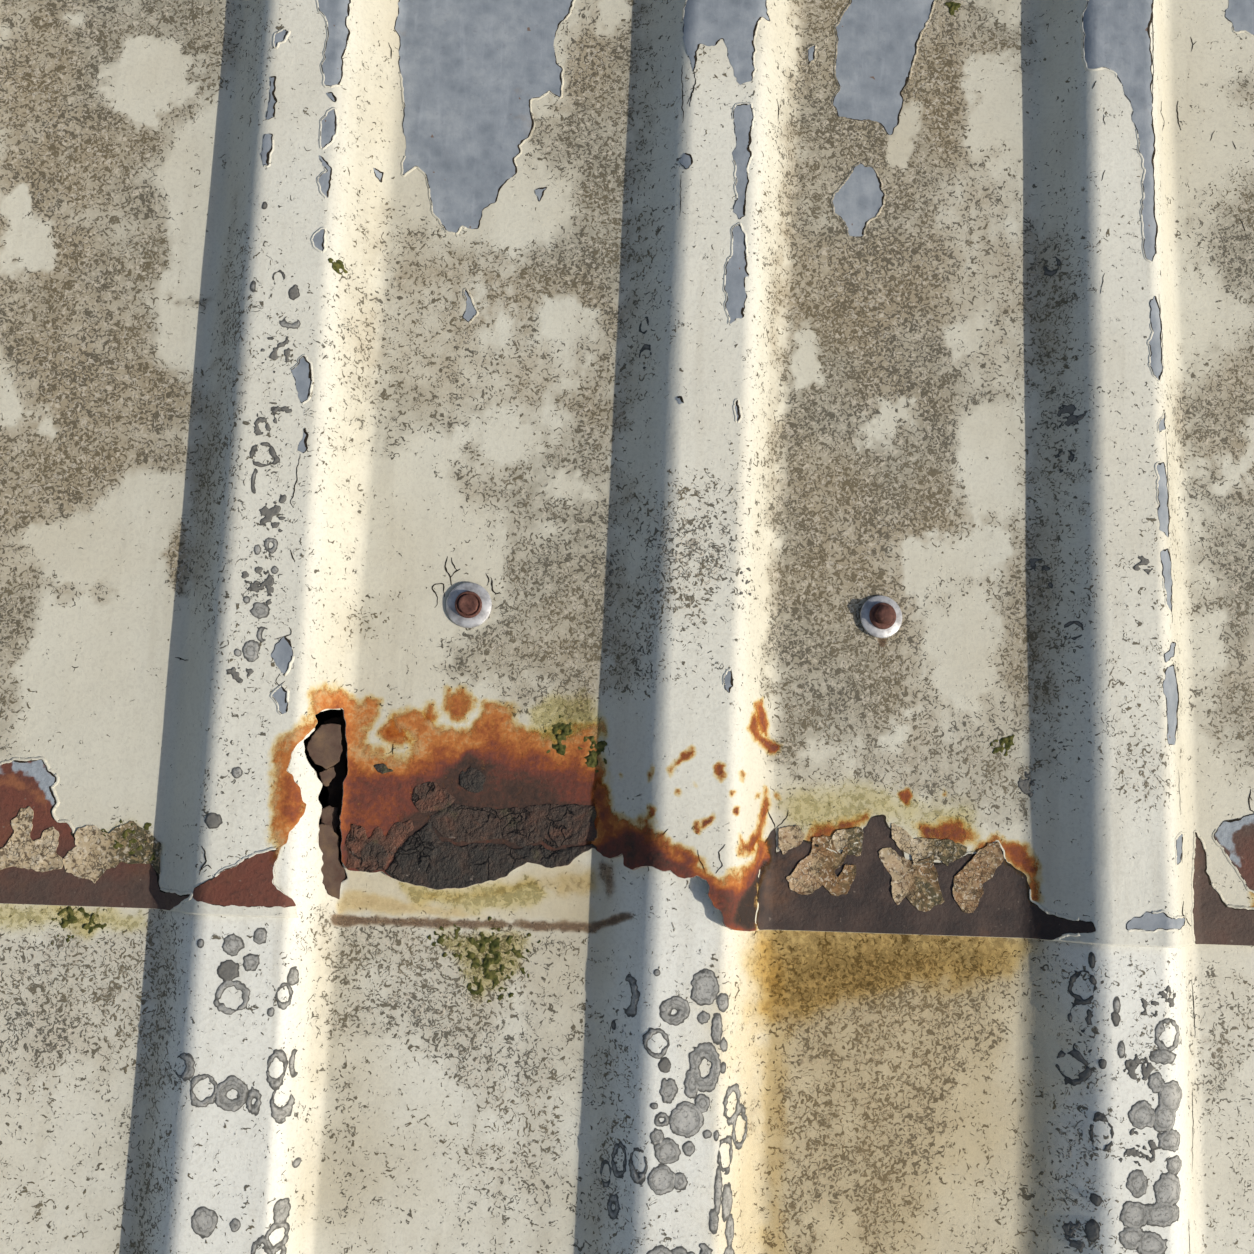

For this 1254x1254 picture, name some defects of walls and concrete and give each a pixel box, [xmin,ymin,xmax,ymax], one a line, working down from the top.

peeling [394,0,575,235]
peeling [679,153,693,169]
peeling [681,0,771,85]
peeling [723,102,755,324]
peeling [830,161,886,238]
peeling [831,0,937,135]
peeling [1080,0,1158,263]
peeling [1146,296,1164,382]
peeling [1154,461,1173,614]
peeling [1163,642,1179,745]
rust [0,689,1096,940]
rust [1191,812,1254,946]